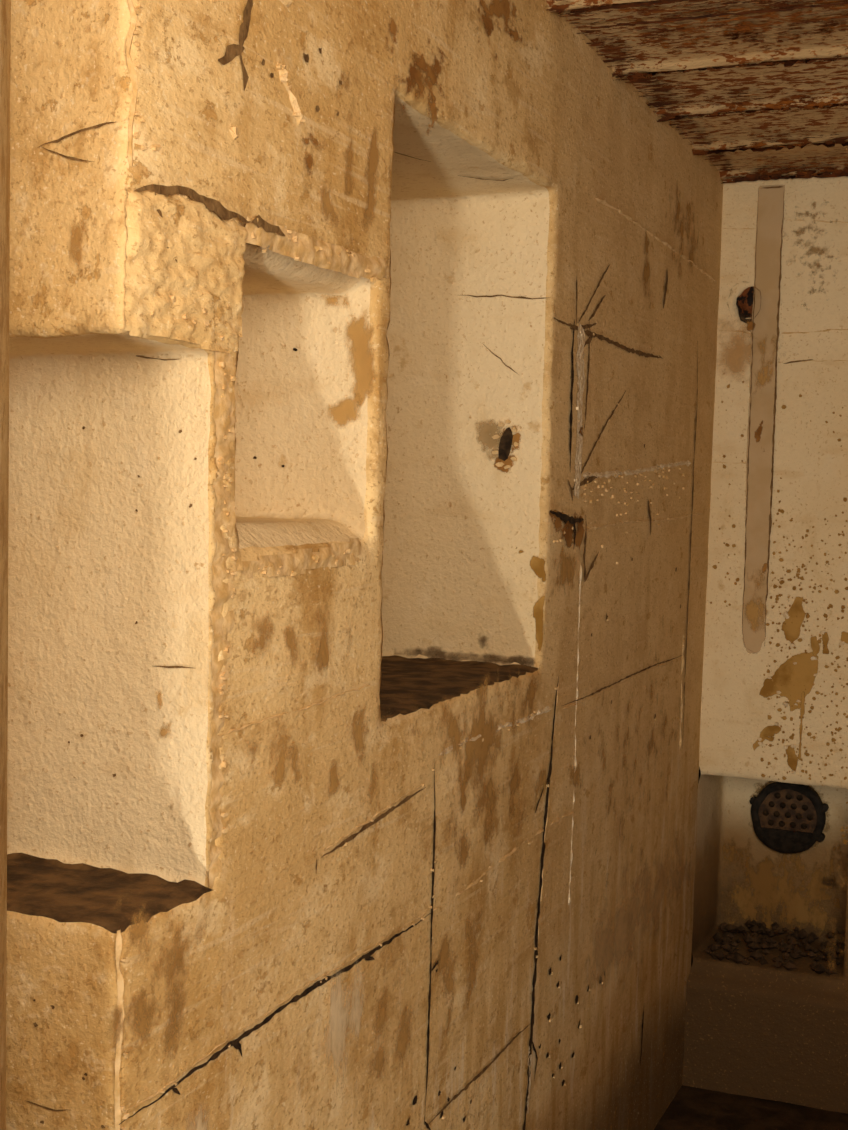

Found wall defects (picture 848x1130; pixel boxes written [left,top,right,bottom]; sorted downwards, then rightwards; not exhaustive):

peeling [329,317,374,426]
spalling [477,420,521,473]
spalling [209,349,362,888]
crack [119,353,698,1130]
peeling [753,596,848,774]